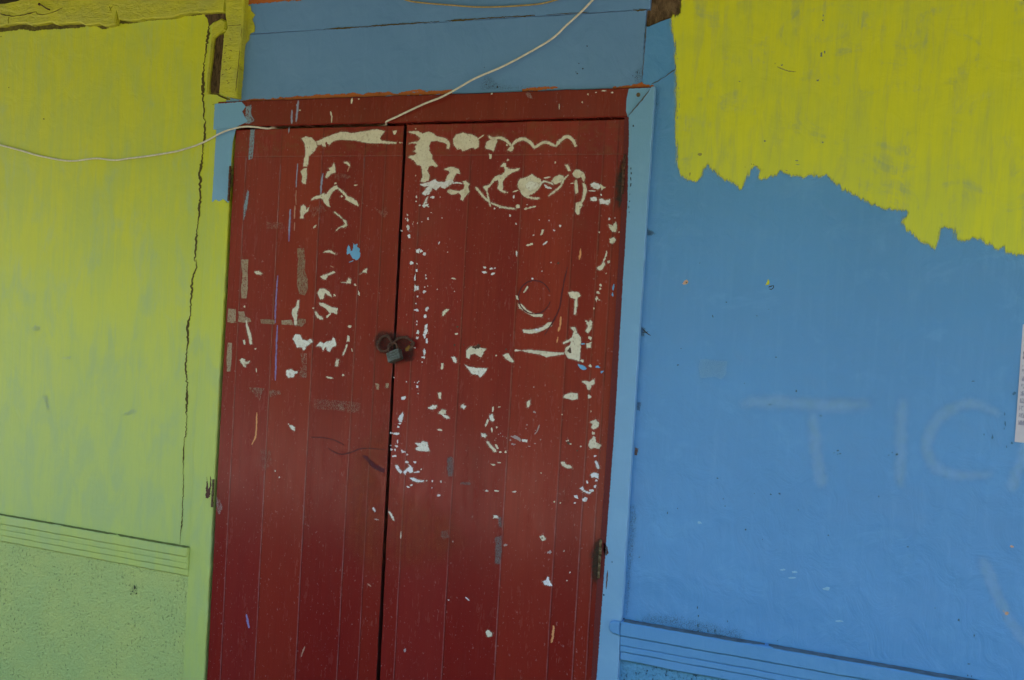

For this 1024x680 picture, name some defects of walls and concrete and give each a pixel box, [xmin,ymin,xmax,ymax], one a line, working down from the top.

peeling [298,128,611,257]
crack [0,6,243,543]
peeling [227,248,368,379]
peeling [409,249,438,363]
peeling [441,218,617,400]
peeling [390,377,442,496]
peeling [427,393,449,431]
peeling [481,406,541,466]
peeling [566,418,603,504]